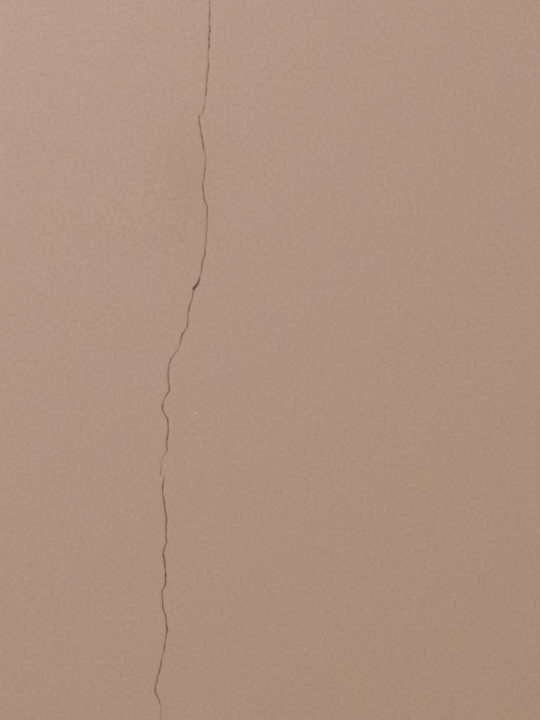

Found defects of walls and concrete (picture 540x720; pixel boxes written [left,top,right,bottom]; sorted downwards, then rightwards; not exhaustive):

crack [155,10,213,720]